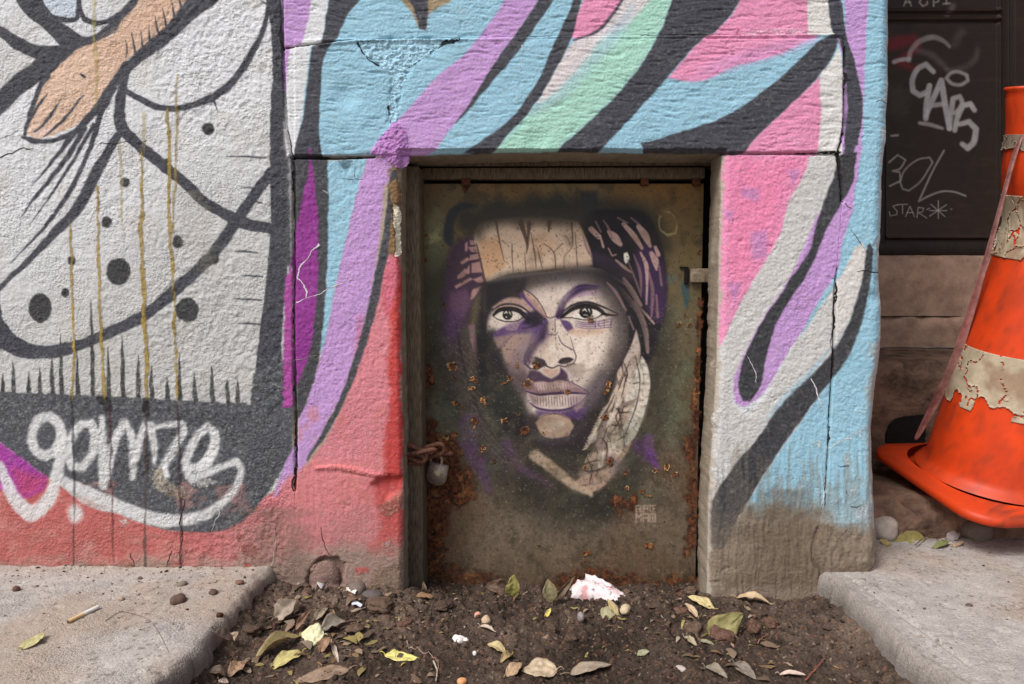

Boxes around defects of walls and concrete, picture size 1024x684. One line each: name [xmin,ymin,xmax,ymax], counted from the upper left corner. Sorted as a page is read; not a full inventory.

crack [287,130,375,492]
corrosion [425,364,477,576]
corrosion [565,549,697,588]
corrosion [653,297,703,557]
crack [758,72,878,508]